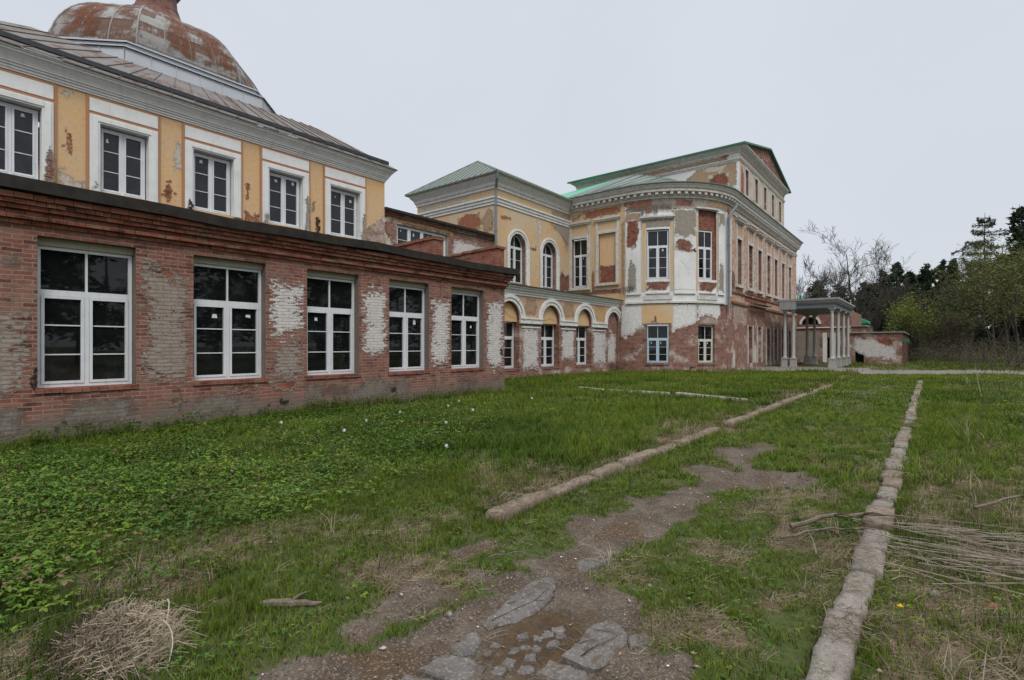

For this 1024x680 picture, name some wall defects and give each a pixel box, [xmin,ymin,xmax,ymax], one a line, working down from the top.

corrosion [61,4,137,36]
corrosion [168,16,234,70]
spalling [44,129,98,189]
peeling [161,141,182,202]
flaking render [450,209,511,254]
flaking render [560,198,730,365]
peeling [140,258,190,384]
peeling [226,278,305,394]
peeling [361,284,387,356]
peeling [431,299,450,372]
peeling [486,301,505,374]
peeling [853,336,899,363]